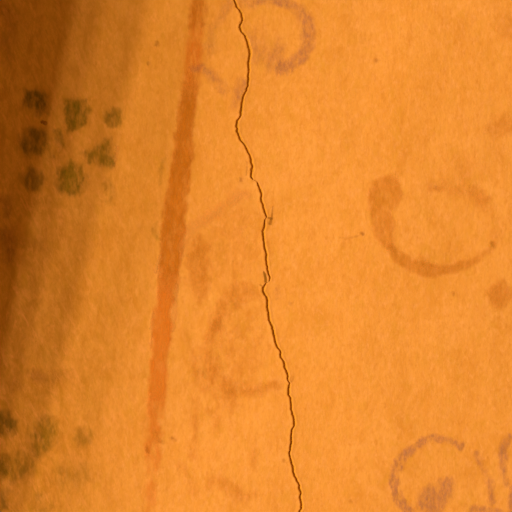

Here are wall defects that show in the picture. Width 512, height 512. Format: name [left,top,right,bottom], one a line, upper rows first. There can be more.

corrosion [161,93,195,277]
crack [233,0,303,512]